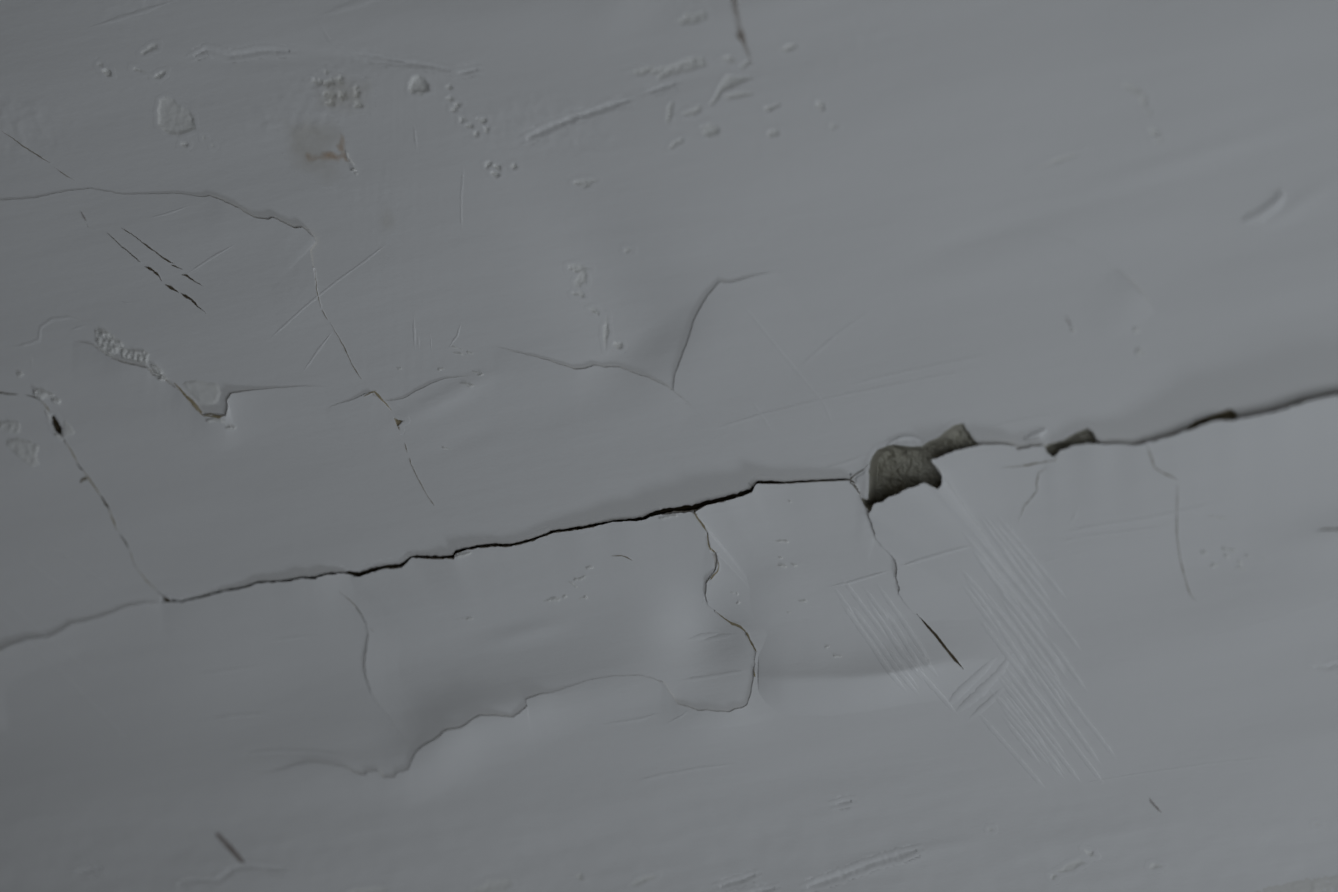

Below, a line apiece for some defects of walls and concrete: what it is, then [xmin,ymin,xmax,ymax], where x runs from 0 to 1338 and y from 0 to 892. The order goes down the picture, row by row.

crack [107,227,207,314]
spalling [44,409,75,442]
crack [162,374,226,419]
peeling [72,328,328,452]
crack [313,267,435,506]
crack [1239,390,1338,419]
crack [0,391,870,678]
crack [1001,457,1058,522]
crack [1146,444,1197,602]
peeling [164,395,1338,816]
crack [916,613,965,670]